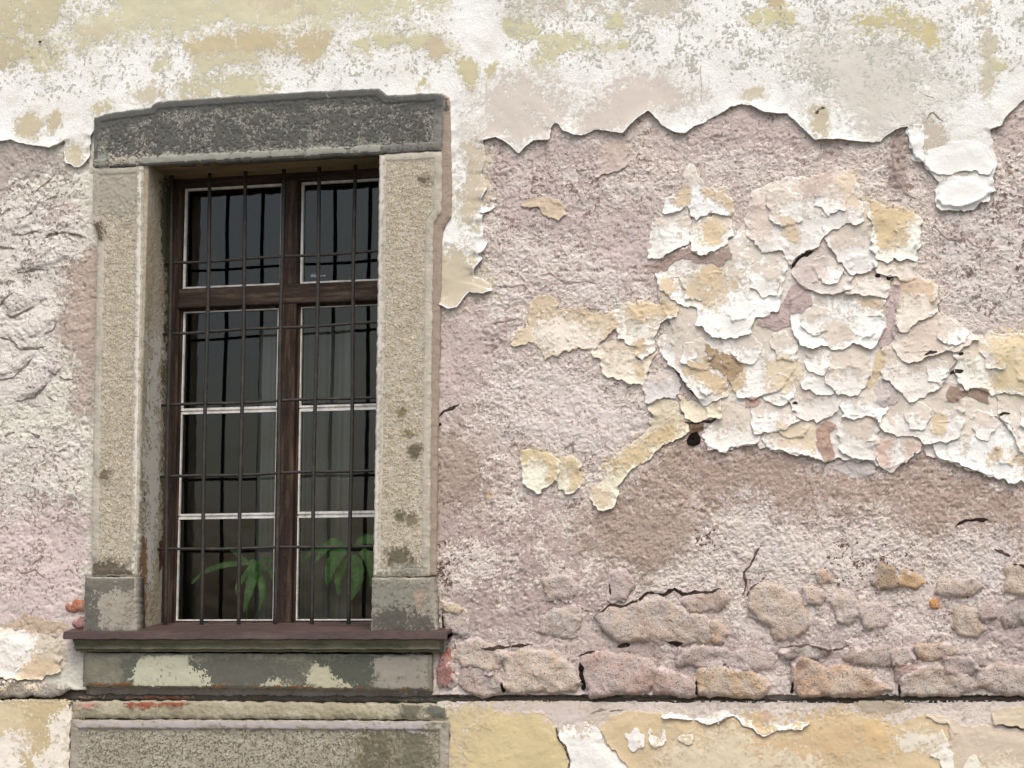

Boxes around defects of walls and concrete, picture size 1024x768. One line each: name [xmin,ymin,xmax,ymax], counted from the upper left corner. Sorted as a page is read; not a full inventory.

peeling [439,100,1024,519]
spalling [0,132,98,768]
peeling [128,655,211,687]
peeling [259,659,354,688]
crack [592,545,766,620]
peeling [433,527,1024,768]